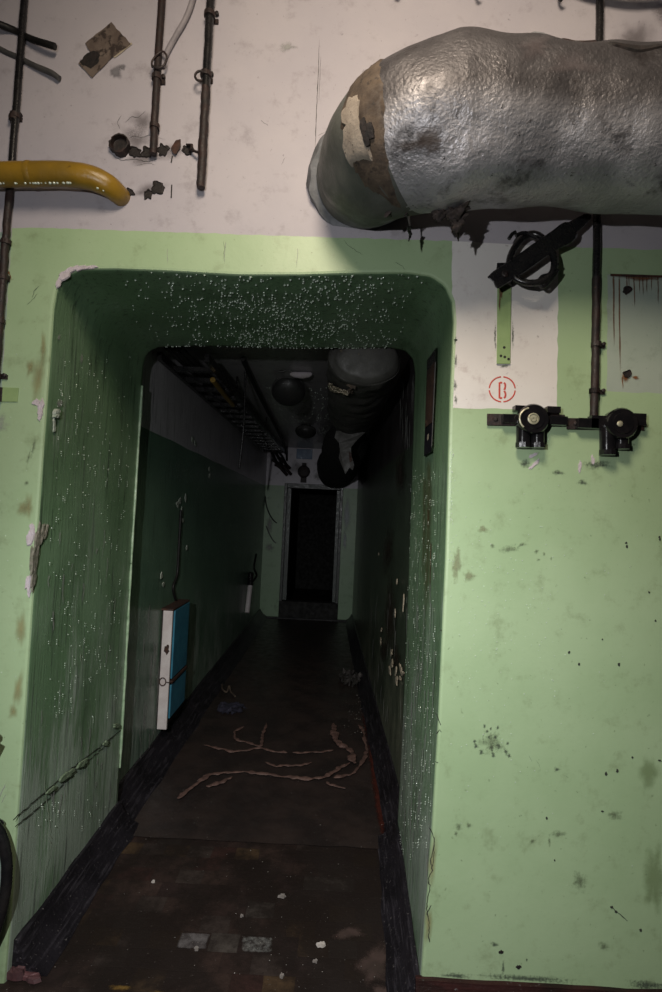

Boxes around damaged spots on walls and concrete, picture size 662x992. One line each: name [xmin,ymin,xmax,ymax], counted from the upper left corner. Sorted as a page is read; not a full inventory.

spalling [55,265,99,289]
rust [610,274,662,351]
spalling [32,398,61,432]
peeling [25,521,49,598]
peeling [380,628,405,685]